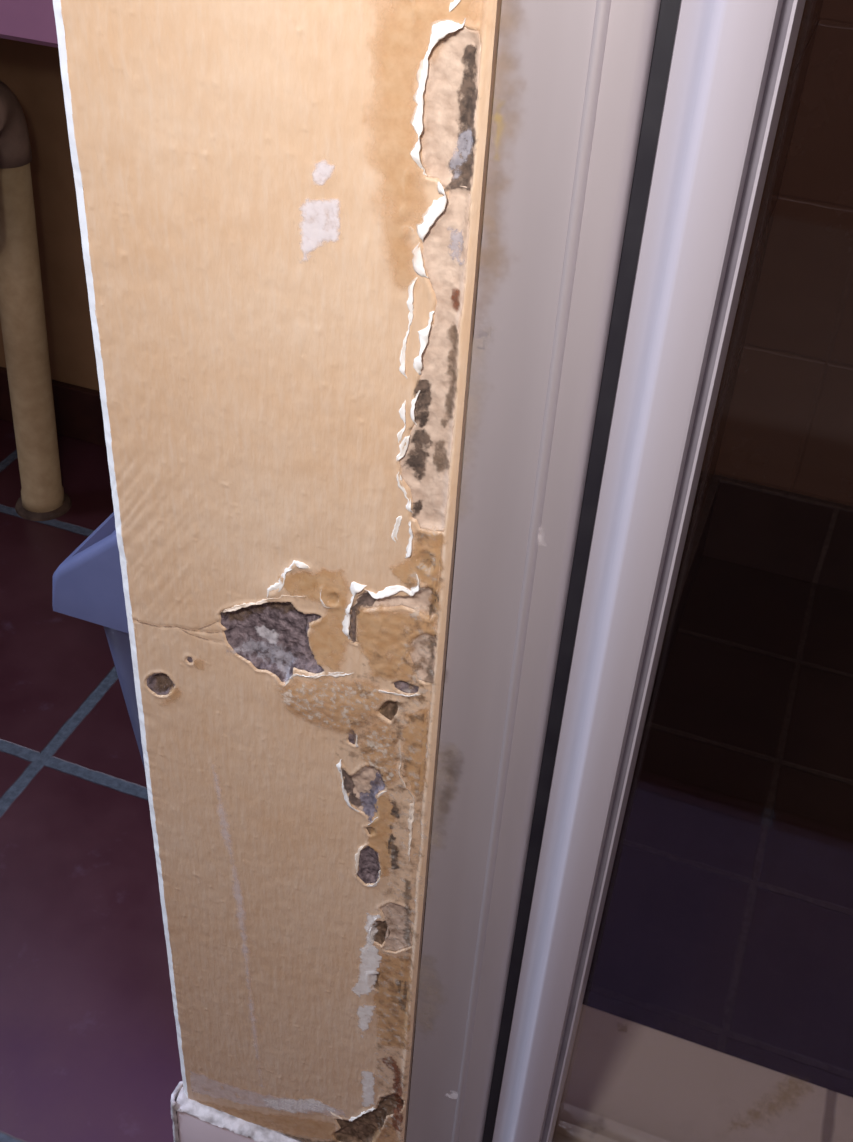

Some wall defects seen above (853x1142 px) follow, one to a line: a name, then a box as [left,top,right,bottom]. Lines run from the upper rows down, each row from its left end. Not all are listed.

peeling [342,0,481,642]
flaking render [147,673,175,695]
crack [140,622,214,640]
flaking render [221,560,352,686]
flaking render [348,729,359,747]
peeling [378,633,436,720]
flaking render [336,759,387,887]
peeling [398,740,415,862]
peeling [352,880,412,1038]
flaking render [331,1094,404,1142]